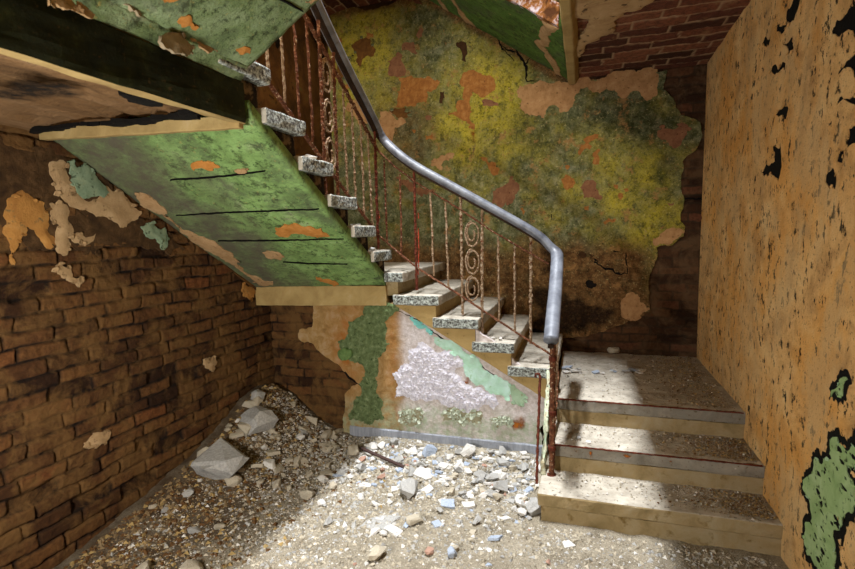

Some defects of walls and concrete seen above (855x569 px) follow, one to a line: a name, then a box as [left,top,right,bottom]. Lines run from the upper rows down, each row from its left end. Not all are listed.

peeling [47,0,95,19]
peeling [158,14,218,57]
peeling [517,67,659,118]
spalling [29,109,201,134]
peeling [126,192,273,297]
crack [594,251,628,275]
leakage [533,288,548,329]
leakage [559,296,613,332]
peeling [338,302,399,425]
peeling [392,317,528,429]
peeling [829,369,852,404]
peeling [800,427,855,569]